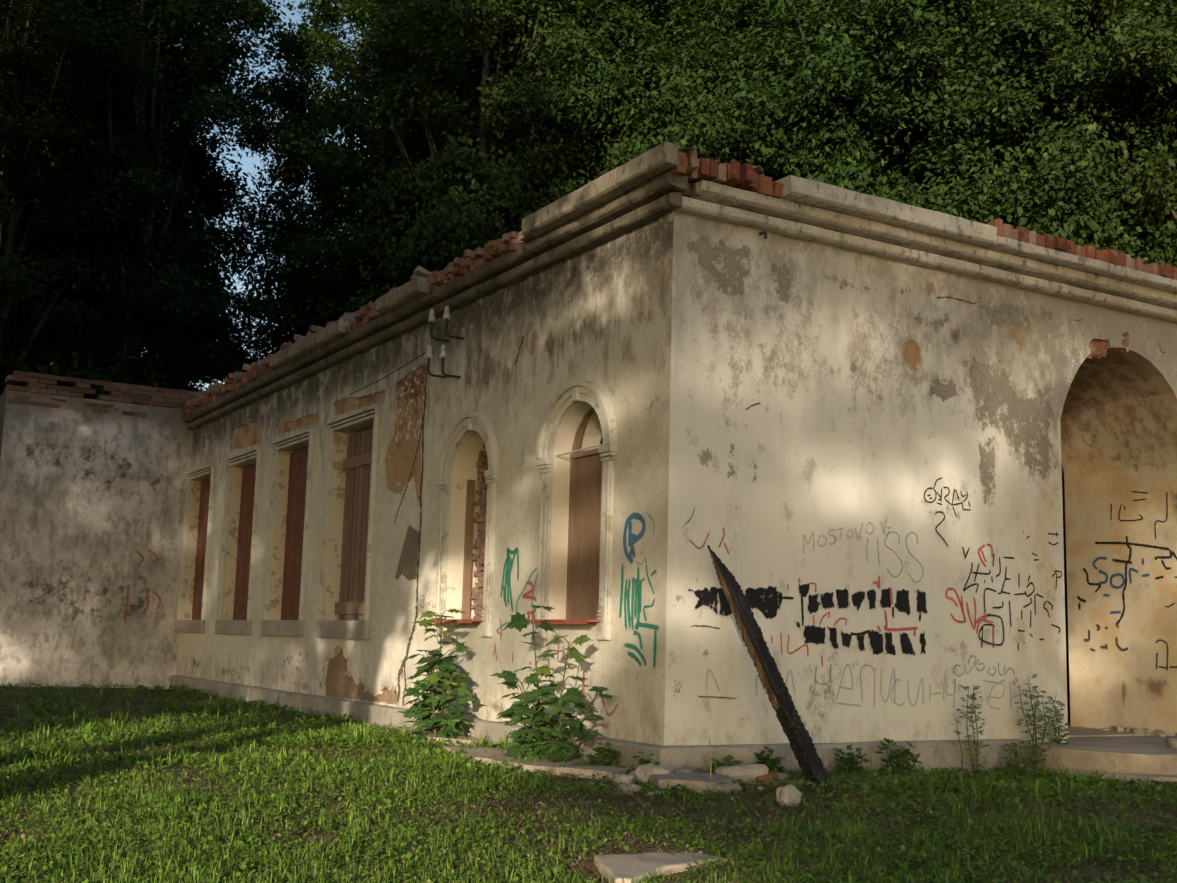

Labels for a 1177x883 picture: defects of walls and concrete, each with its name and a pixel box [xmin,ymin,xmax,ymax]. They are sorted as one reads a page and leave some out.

rust [904,340,920,368]
crack [394,367,427,705]